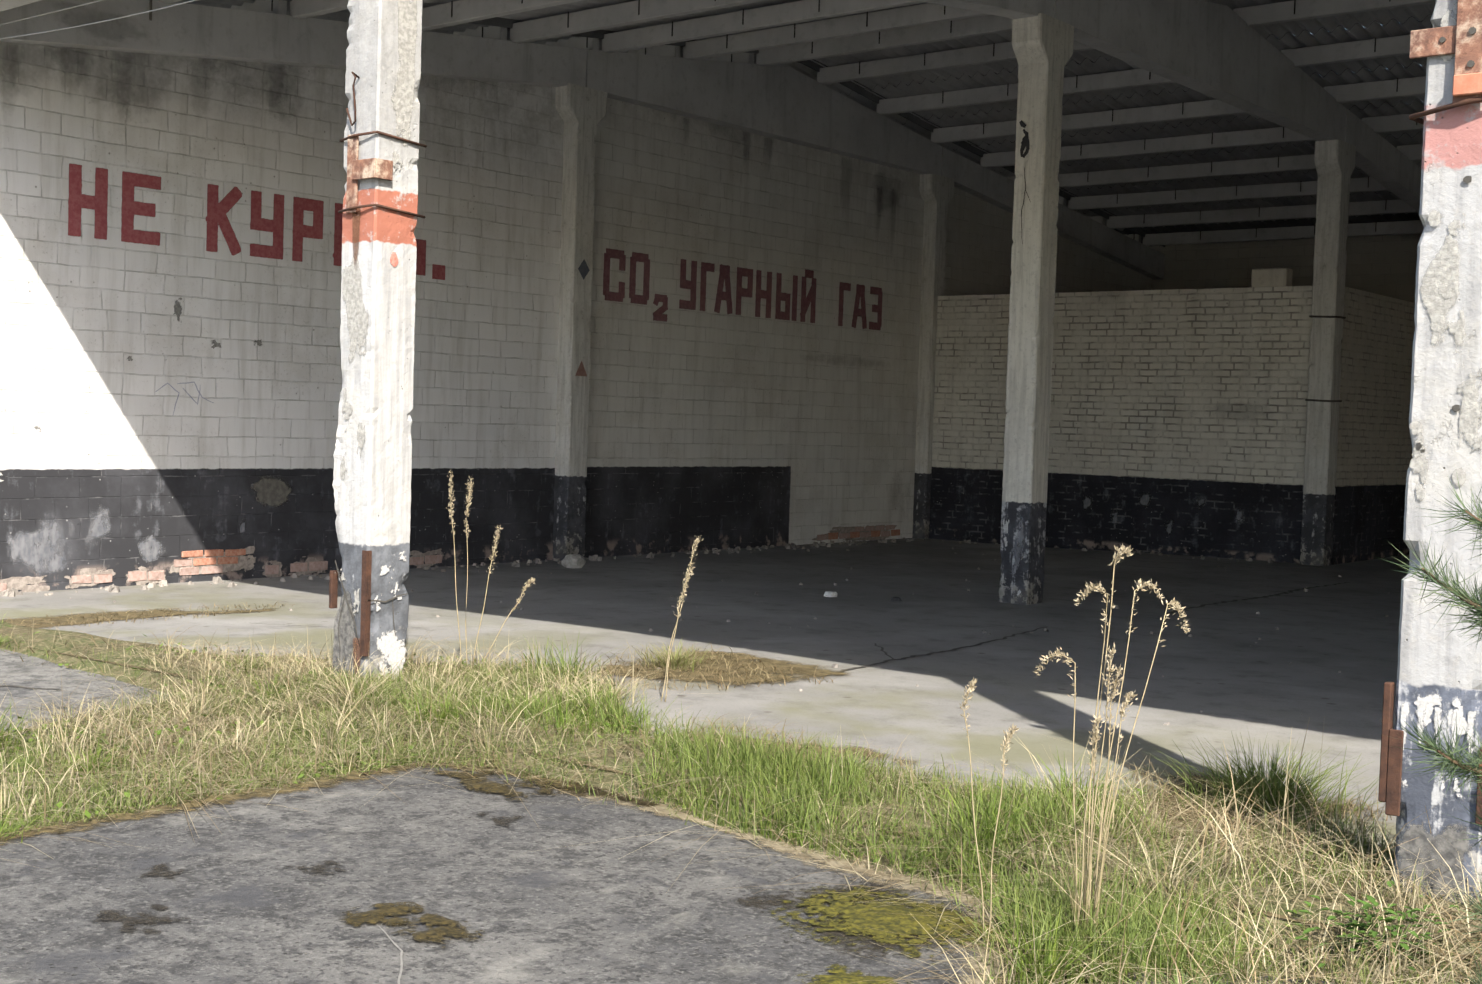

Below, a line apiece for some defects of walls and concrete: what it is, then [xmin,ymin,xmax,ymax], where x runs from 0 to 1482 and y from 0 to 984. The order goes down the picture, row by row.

peeling [342,257,369,362]
corrosion [353,208,361,262]
peeling [1420,210,1466,352]
peeling [340,388,365,480]
peeling [1458,368,1482,451]
peeling [89,510,110,538]
flaking render [0,521,447,681]
corrosion [353,550,372,677]
crack [800,627,1045,677]
crack [1163,582,1349,614]
corrosion [1378,681,1404,816]
peeling [1401,694,1477,755]